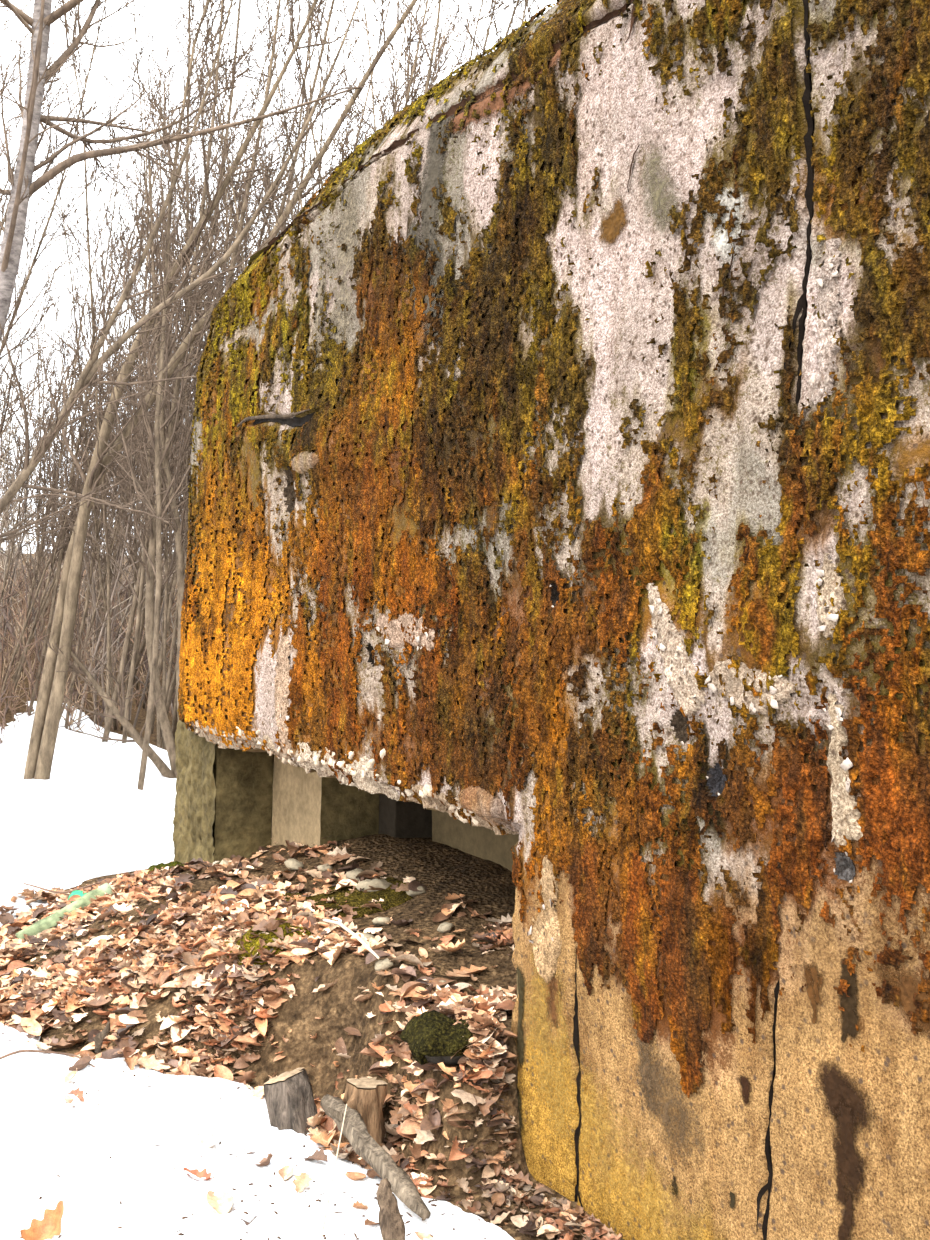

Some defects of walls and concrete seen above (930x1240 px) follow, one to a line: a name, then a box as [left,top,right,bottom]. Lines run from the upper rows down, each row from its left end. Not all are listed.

crack [778,0,815,409]
crack [573,945,584,1211]
crack [756,977,780,1240]
water stain [816,1063,875,1240]